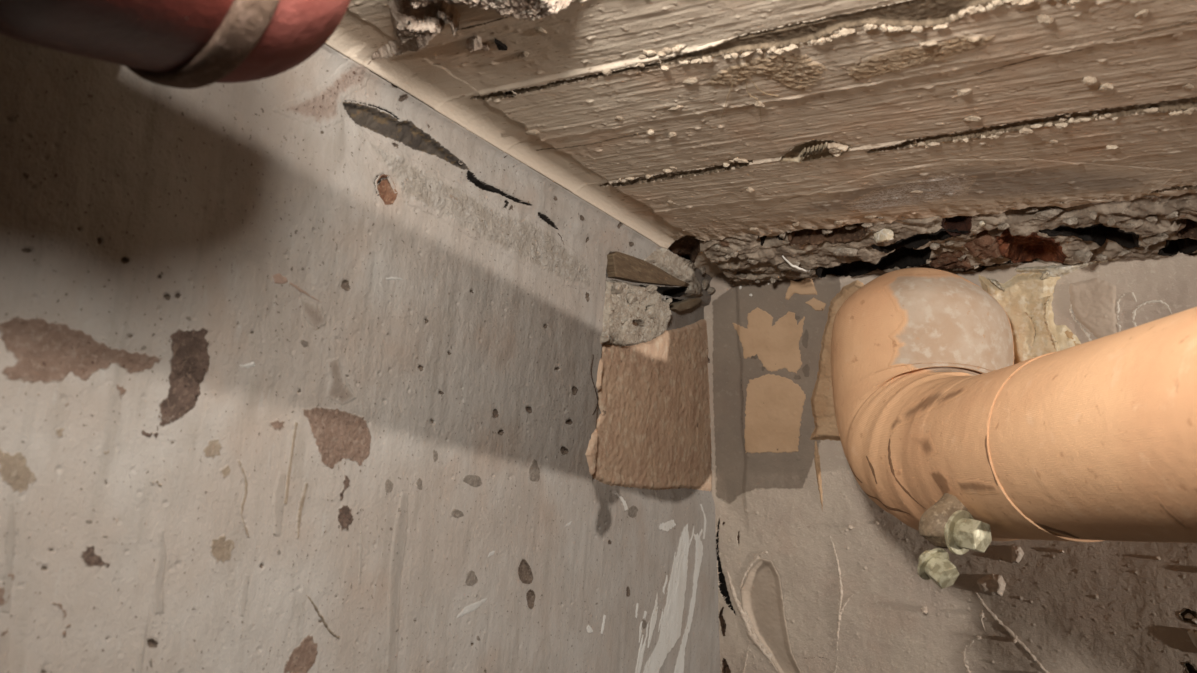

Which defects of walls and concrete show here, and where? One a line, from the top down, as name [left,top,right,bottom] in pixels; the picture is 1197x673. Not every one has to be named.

crack [341,100,564,244]
leakage [326,357,357,405]
peeling [732,278,826,454]
leakage [272,421,308,540]
leakage [385,492,408,673]
spalling [1183,661,1197,673]